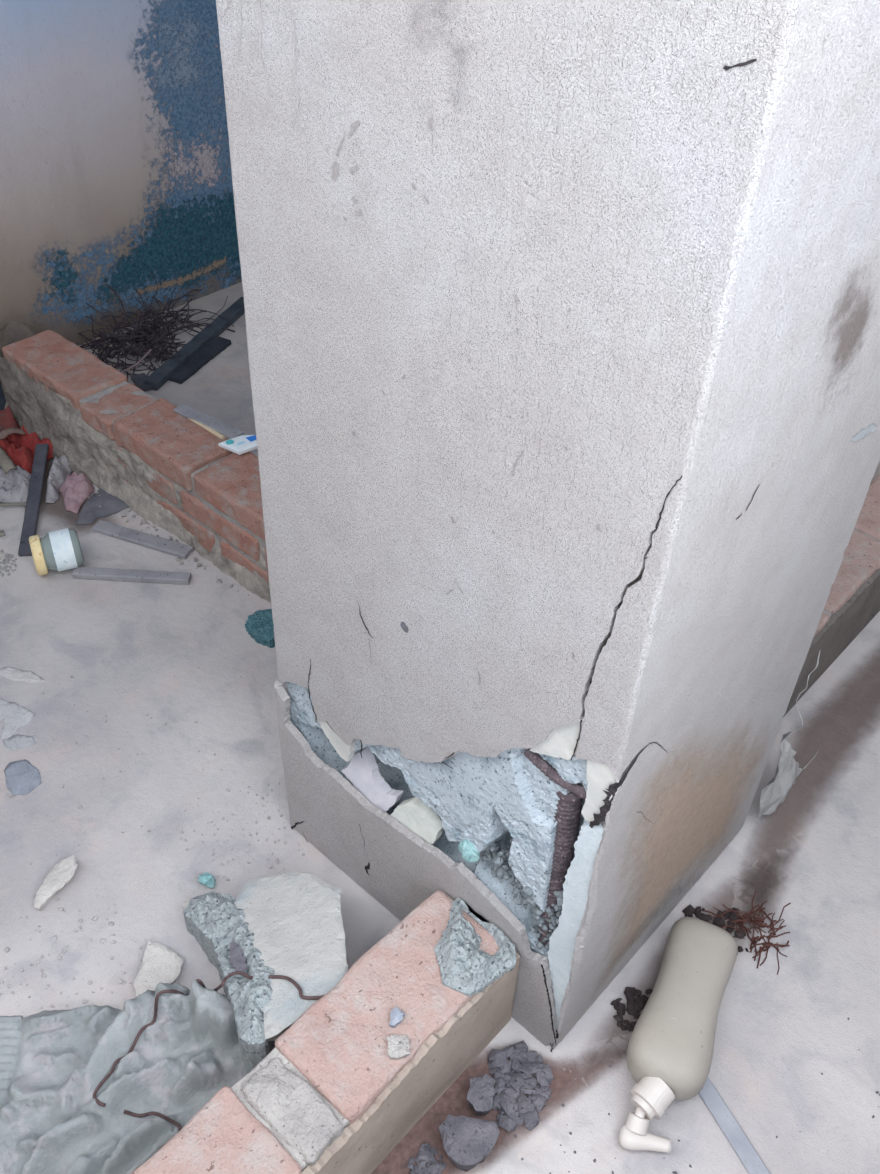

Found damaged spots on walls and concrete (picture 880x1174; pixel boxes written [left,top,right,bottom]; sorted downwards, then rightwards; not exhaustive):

peeling [154,12,210,100]
peeling [163,129,228,190]
peeling [137,256,226,297]
crack [571,476,682,760]
spalling [287,682,626,1030]
spalling [386,1007,410,1060]